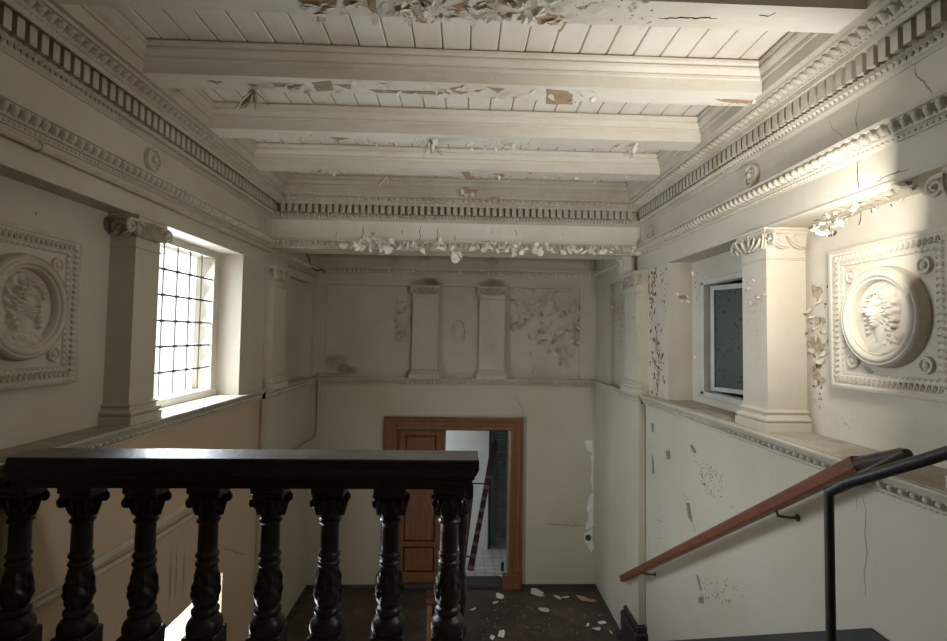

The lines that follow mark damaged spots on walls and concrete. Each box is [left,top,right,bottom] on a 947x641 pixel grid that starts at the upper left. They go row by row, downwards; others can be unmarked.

peeling [298,0,569,32]
peeling [272,81,596,106]
peeling [339,232,642,264]
flaking render [806,179,927,237]
peeling [648,267,699,396]
peeling [805,283,828,410]
flaking render [584,439,594,553]
crack [856,495,868,597]